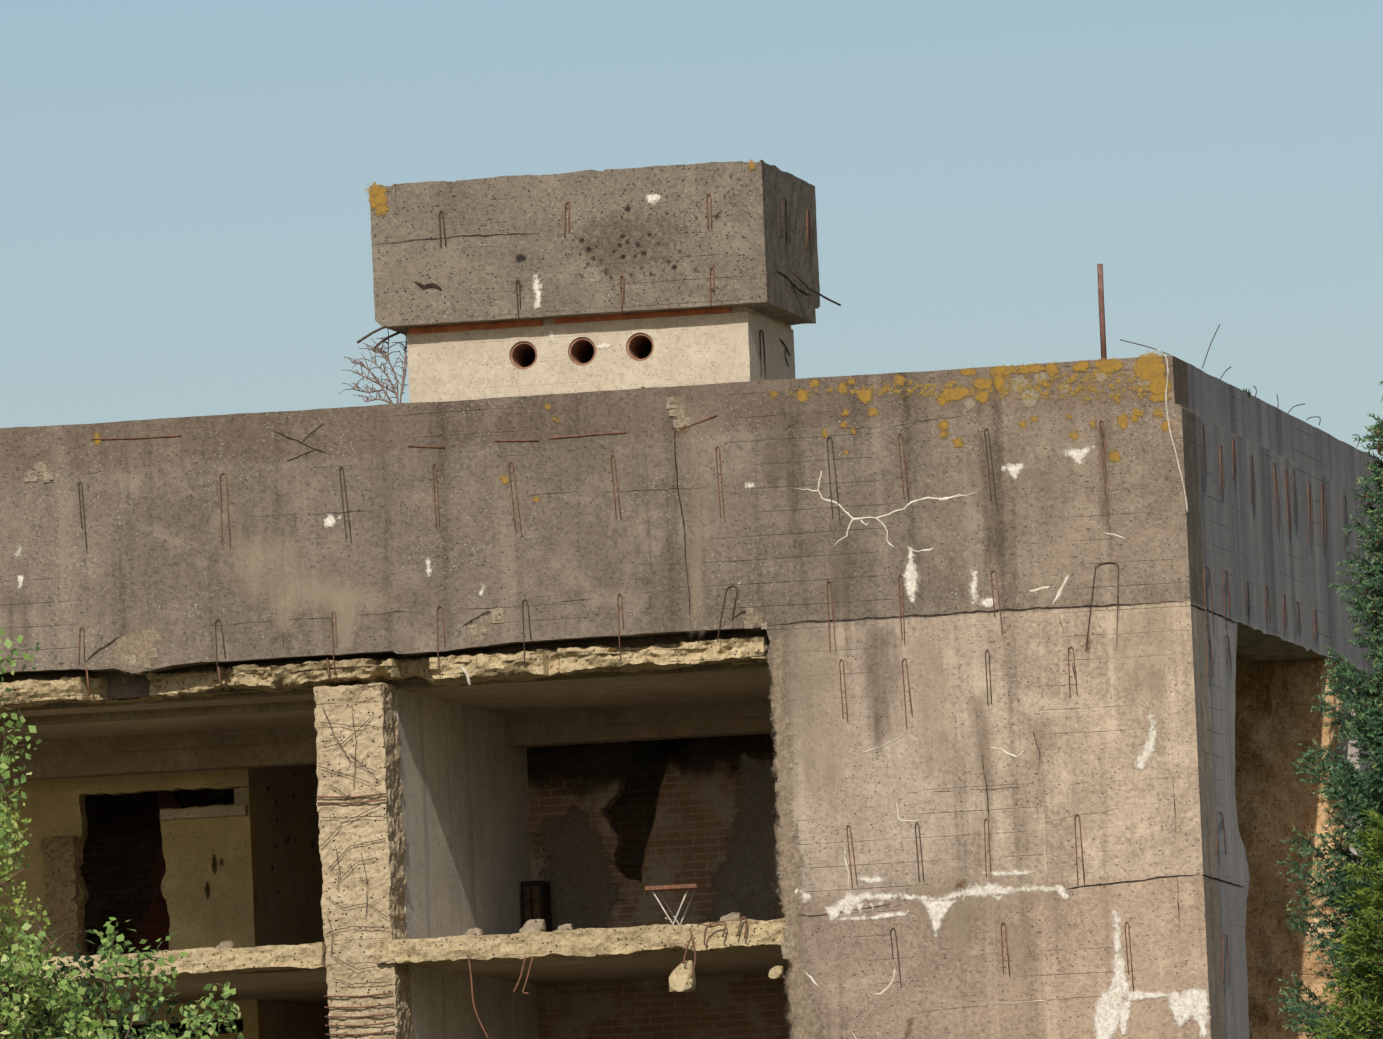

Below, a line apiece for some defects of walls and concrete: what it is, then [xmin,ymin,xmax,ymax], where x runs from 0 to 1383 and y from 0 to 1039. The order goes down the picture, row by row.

crack [795,471,976,552]
damp [902,546,918,602]
spalling [317,793,386,804]
spalling [41,836,88,957]
spalling [205,855,223,899]
damp [826,870,1068,941]
damp [1093,911,1210,1039]
spalling [324,992,395,1035]